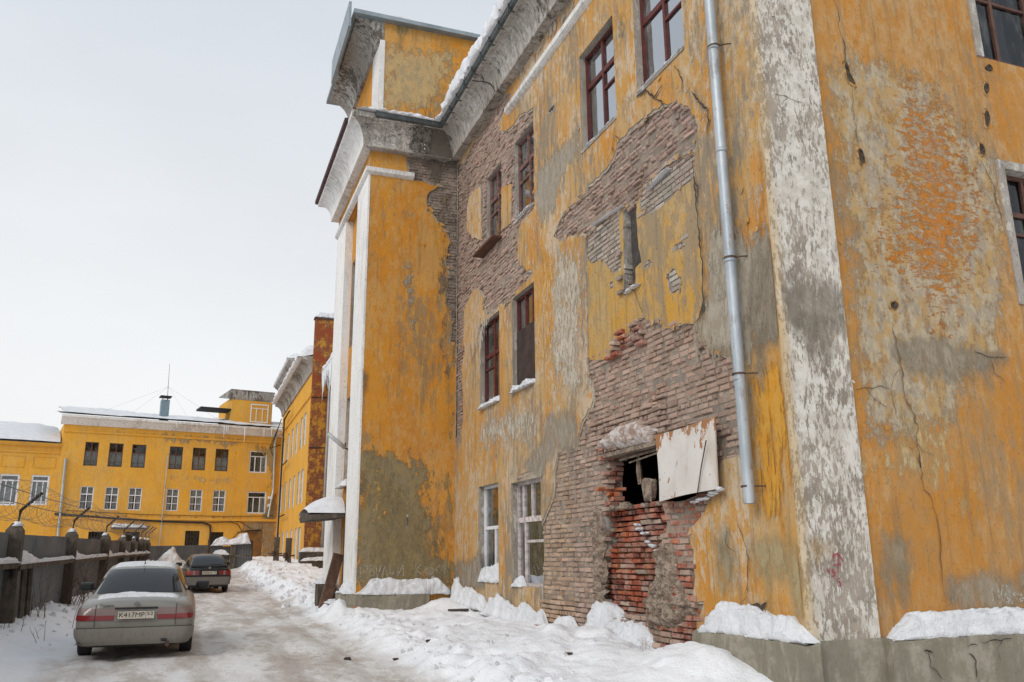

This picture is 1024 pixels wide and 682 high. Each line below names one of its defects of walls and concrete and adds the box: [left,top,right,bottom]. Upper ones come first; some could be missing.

crack [636,66,709,129]
flaking render [371,41,740,648]
crack [691,150,705,326]
water stain [693,221,846,373]
water stain [356,445,484,597]
crack [856,321,947,604]
crack [968,638,1012,678]